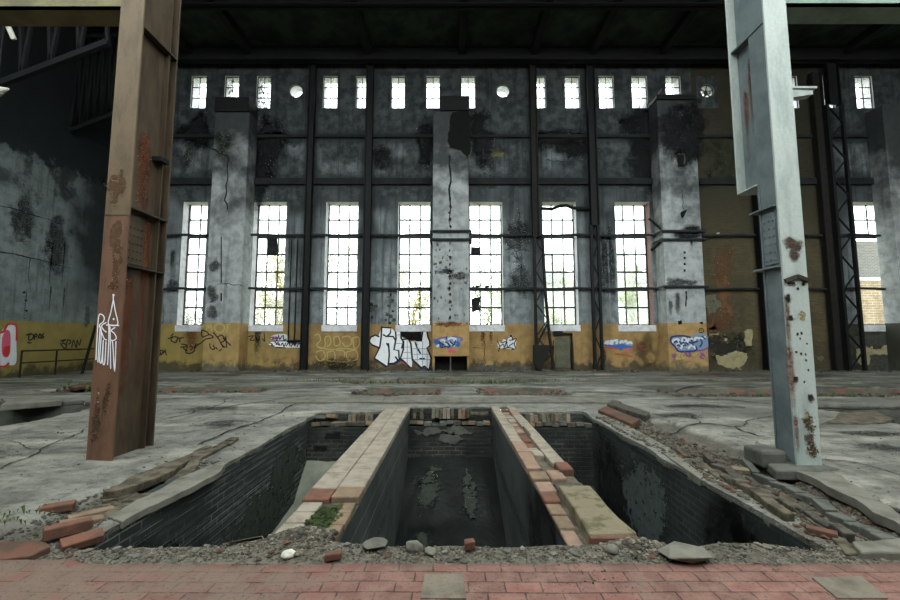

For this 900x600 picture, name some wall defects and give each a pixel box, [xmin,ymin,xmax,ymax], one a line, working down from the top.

spalling [447,111,472,160]
water stain [10,184,35,242]
crack [446,155,454,230]
water stain [46,215,71,275]
rust [785,237,803,260]
rust [107,220,150,370]
flaking render [699,258,733,341]
peeling [716,329,753,370]
rust [785,281,809,393]
crack [0,429,84,469]
crack [598,386,770,436]
rust [794,394,819,458]